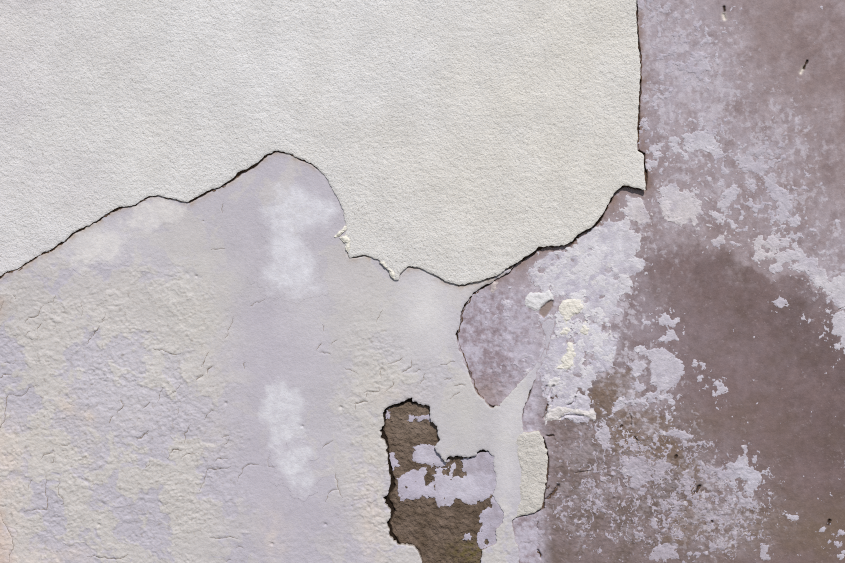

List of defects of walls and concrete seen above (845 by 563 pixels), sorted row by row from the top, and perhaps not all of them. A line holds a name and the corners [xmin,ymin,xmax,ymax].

crack [199,435,270,491]
spalling [0,152,548,563]
spalling [456,0,845,563]